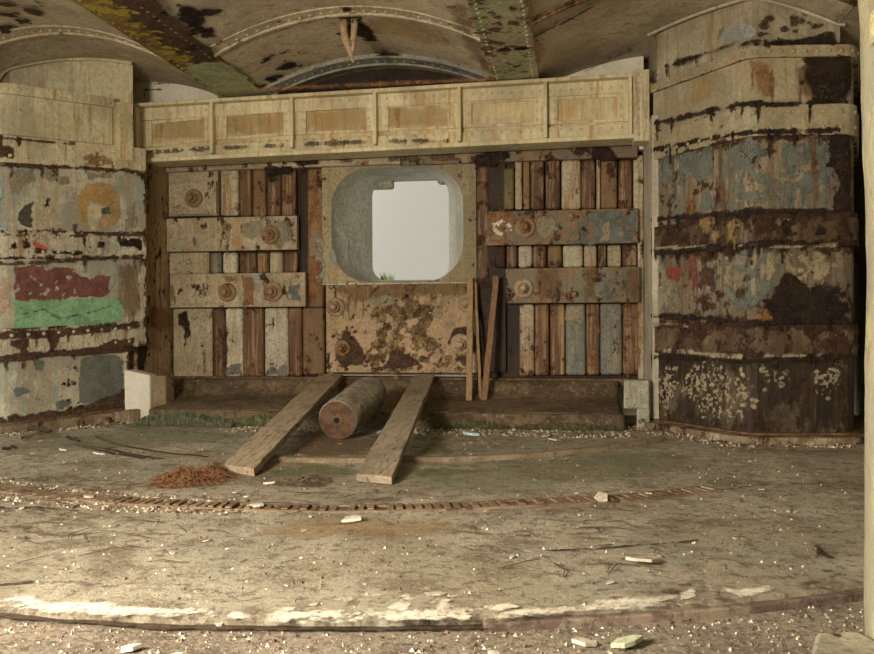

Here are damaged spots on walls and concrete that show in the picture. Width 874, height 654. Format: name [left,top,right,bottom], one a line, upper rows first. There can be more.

rust [0,134,146,181]
peeling [728,137,831,213]
rust [650,57,854,339]
peeling [492,219,512,236]
peeling [566,210,636,246]
rust [0,232,145,267]
rust [0,389,125,423]
rust [0,316,150,387]
rust [448,327,476,369]
peeling [655,348,759,422]
peeling [759,353,806,391]
peeling [814,364,841,401]